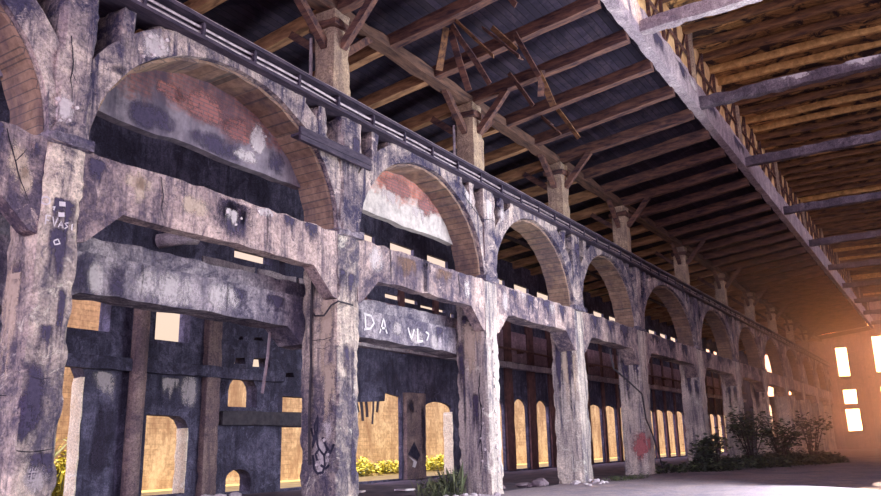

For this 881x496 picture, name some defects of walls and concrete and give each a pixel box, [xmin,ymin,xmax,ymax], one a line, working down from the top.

leakage [129,101,175,131]
flaking render [157,80,267,163]
leakage [192,131,238,159]
leakage [268,153,285,174]
peeling [184,196,206,216]
peeling [217,198,273,238]
flaking render [381,177,436,216]
leakage [17,362,45,444]